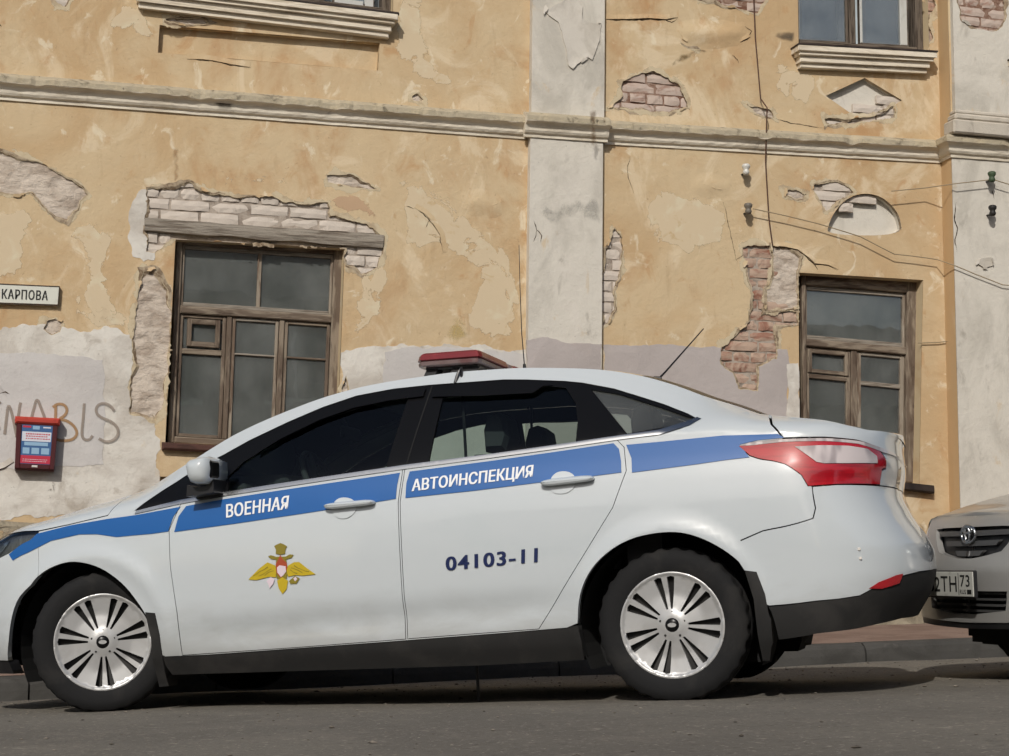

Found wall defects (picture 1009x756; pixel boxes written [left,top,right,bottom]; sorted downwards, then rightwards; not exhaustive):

peeling [110,6,152,37]
spalling [162,14,217,29]
peeling [543,0,601,69]
flaking render [695,0,769,16]
flaking render [957,0,1009,31]
flaking render [604,66,691,117]
flaking render [820,95,900,130]
spalling [0,148,116,321]
spalling [37,315,65,335]
flaking render [127,166,389,425]
flaking render [602,224,626,332]
flaking render [716,238,806,391]